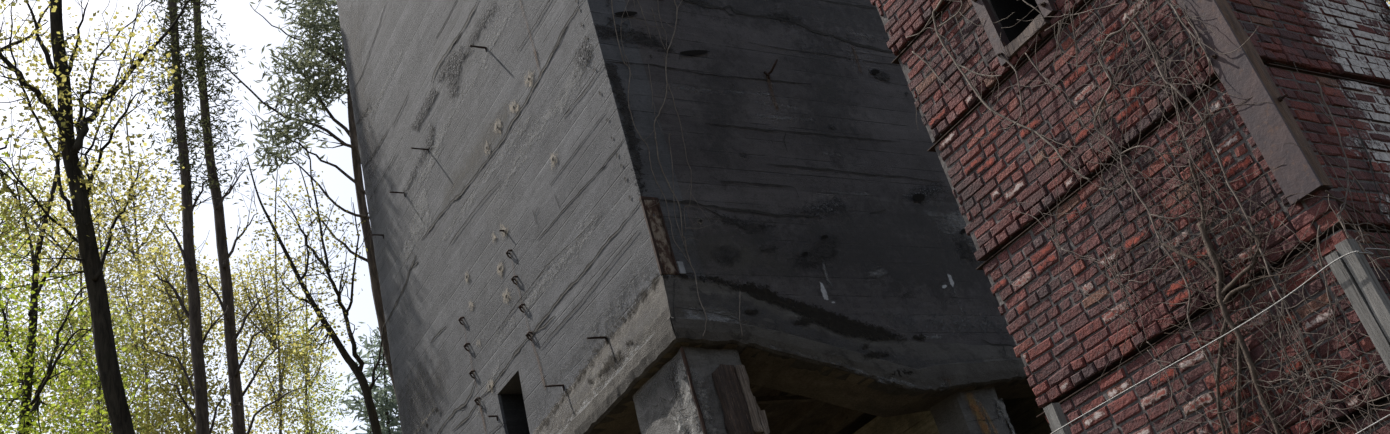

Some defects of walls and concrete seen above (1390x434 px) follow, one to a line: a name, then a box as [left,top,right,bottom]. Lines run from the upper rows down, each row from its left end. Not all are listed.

efflorescence [1304,0,1390,179]
spalling [671,363,717,434]